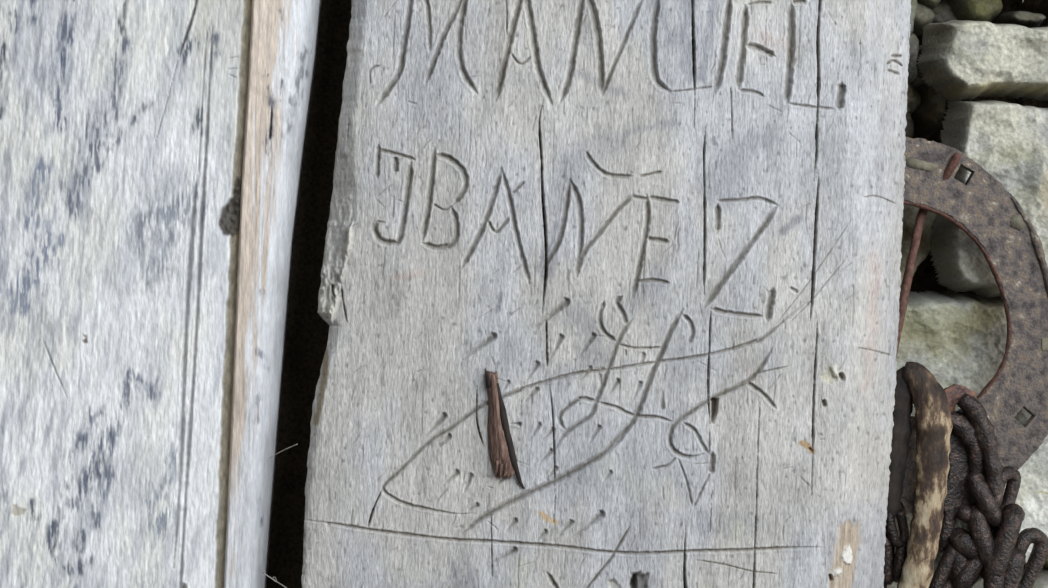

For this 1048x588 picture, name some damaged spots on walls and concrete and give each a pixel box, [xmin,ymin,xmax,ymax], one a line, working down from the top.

crack [809,0,823,498]
peeling [825,518,866,588]